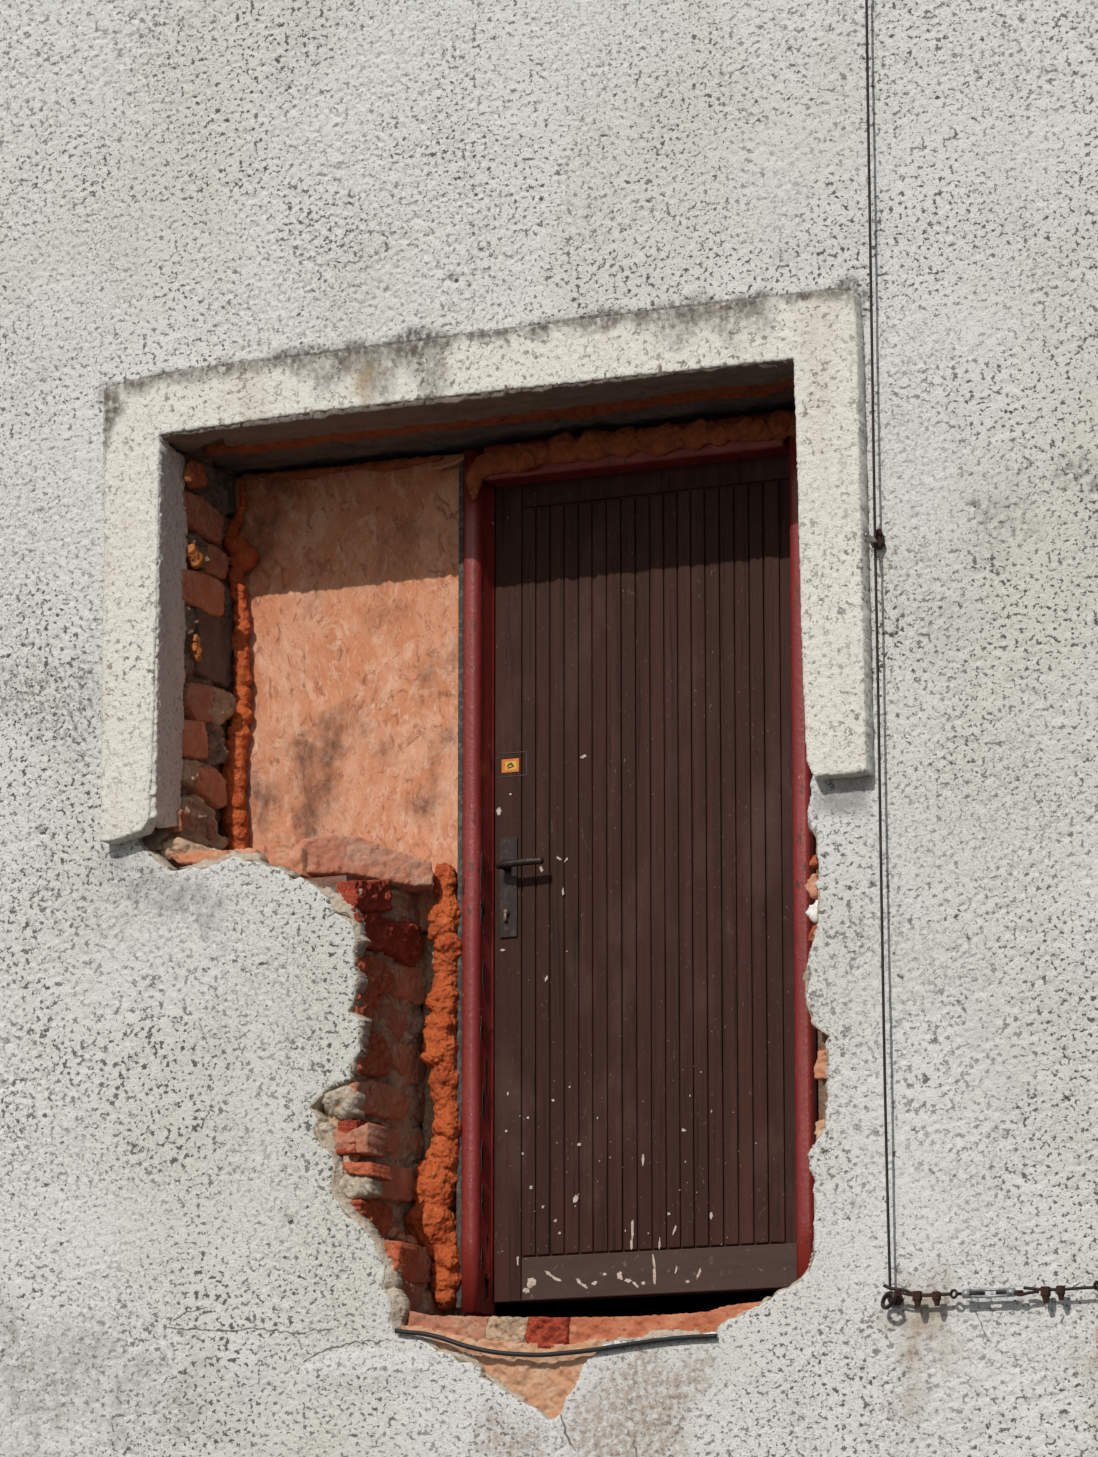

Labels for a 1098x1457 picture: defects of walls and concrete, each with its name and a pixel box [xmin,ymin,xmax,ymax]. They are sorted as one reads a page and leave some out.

spalling [138,447,830,1420]